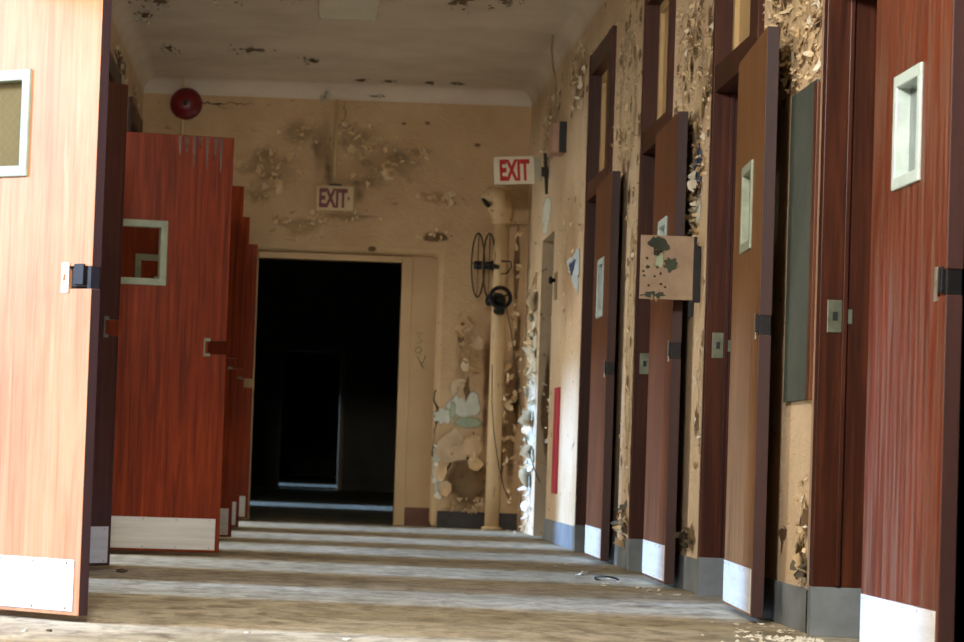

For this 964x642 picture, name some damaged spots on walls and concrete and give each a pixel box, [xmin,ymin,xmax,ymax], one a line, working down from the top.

peeling [447,0,526,14]
peeling [674,0,714,245]
peeling [762,0,822,108]
peeling [610,0,680,549]
flaking render [432,309,486,515]
peeling [790,475,809,584]